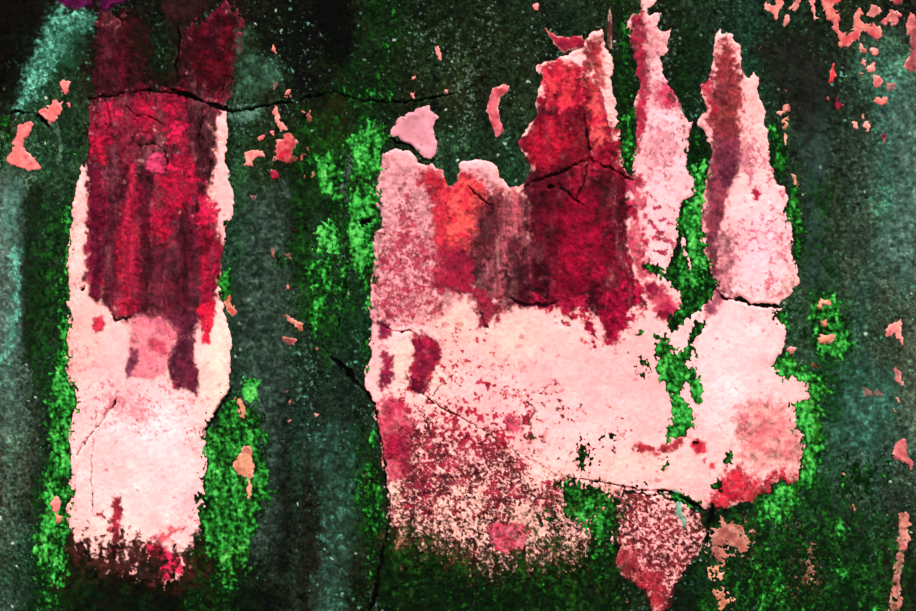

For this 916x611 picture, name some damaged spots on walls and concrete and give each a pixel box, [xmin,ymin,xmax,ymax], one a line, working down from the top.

peeling [200,97,234,246]
crack [88,29,468,175]
water stain [317,95,355,201]
water stain [629,9,680,153]
peeling [764,0,916,117]
peeling [50,164,246,590]
crack [322,161,391,611]
crack [415,371,511,448]
peeling [360,0,810,611]
water stain [372,78,801,611]
water stain [57,496,289,611]
crack [567,476,714,548]